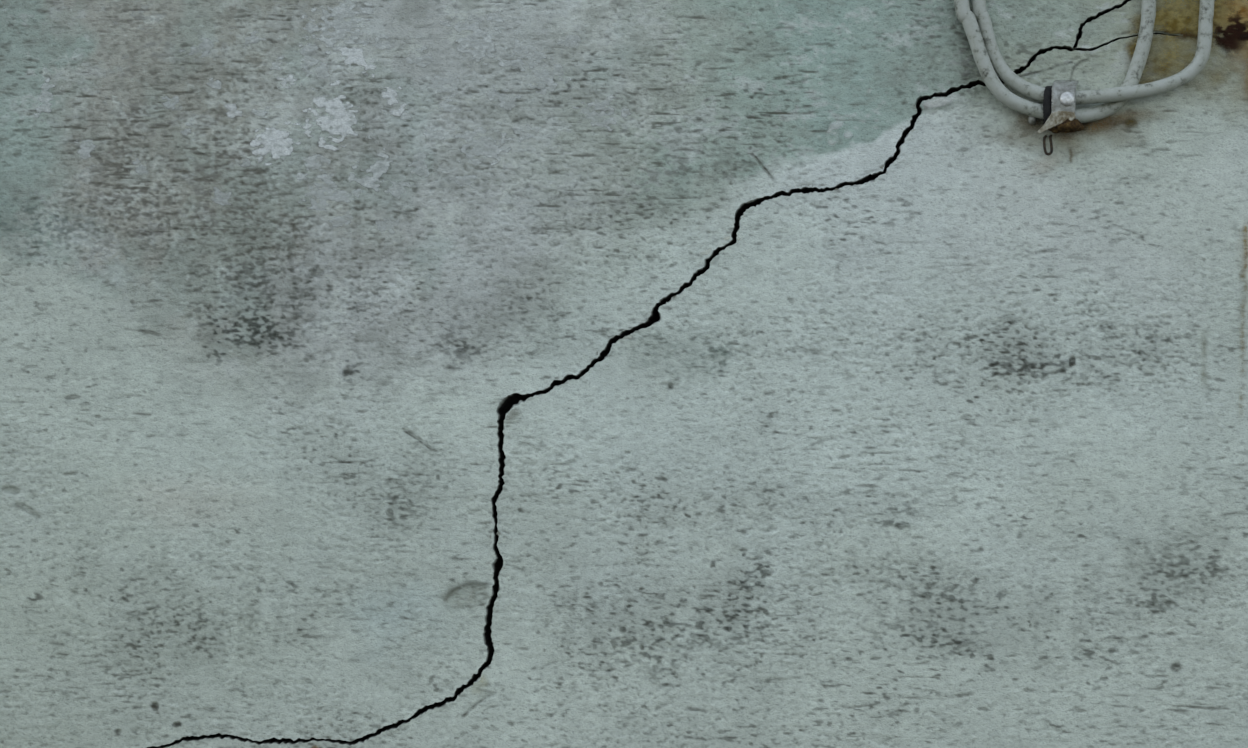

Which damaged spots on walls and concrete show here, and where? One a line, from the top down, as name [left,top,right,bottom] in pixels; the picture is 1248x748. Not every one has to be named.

crack [147,0,1138,748]
corrosion [1127,0,1248,84]